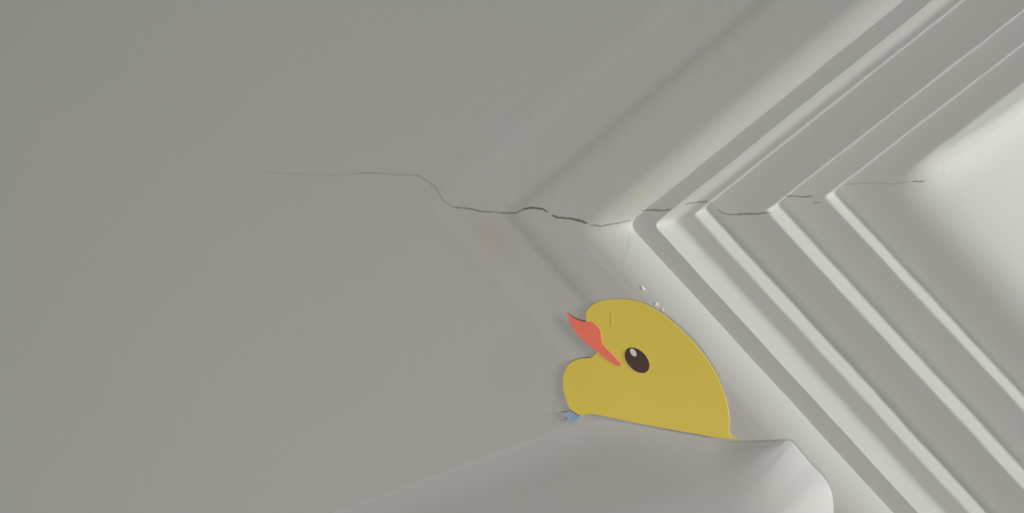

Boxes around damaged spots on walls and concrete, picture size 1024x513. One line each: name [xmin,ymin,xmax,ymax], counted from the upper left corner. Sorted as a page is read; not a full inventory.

crack [263,172,820,227]